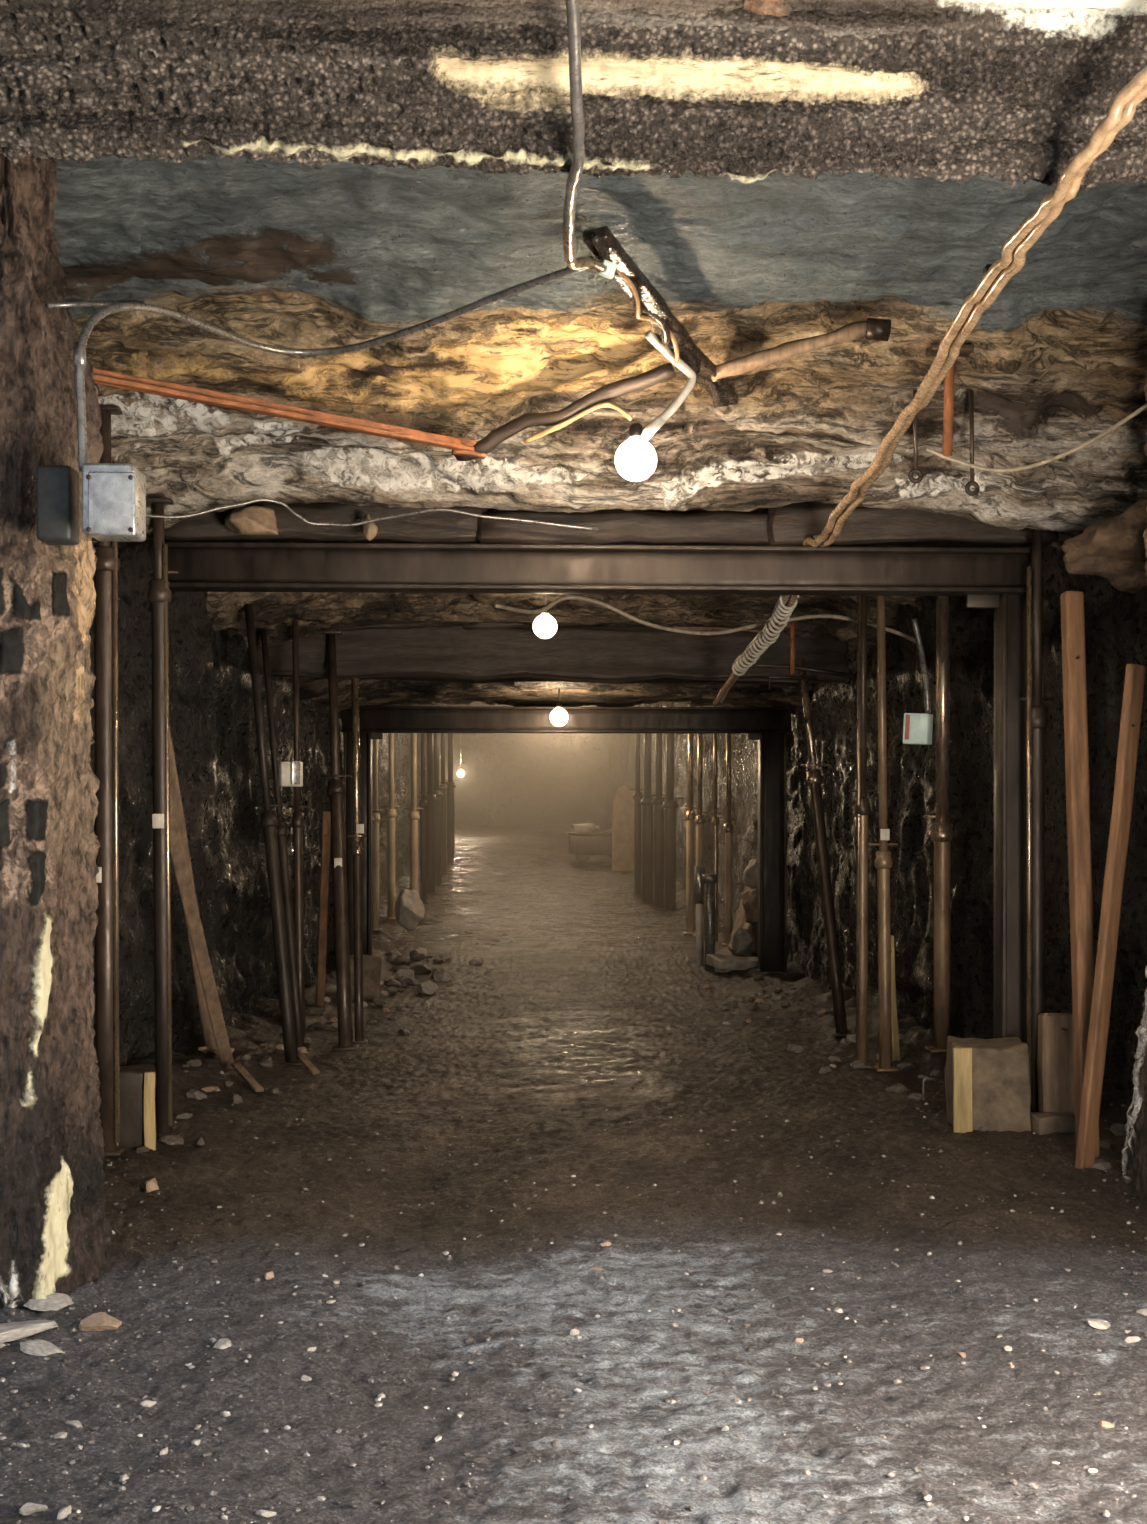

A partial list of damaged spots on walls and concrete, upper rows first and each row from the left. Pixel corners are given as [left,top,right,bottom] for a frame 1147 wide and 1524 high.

spalling [0,1157,73,1308]